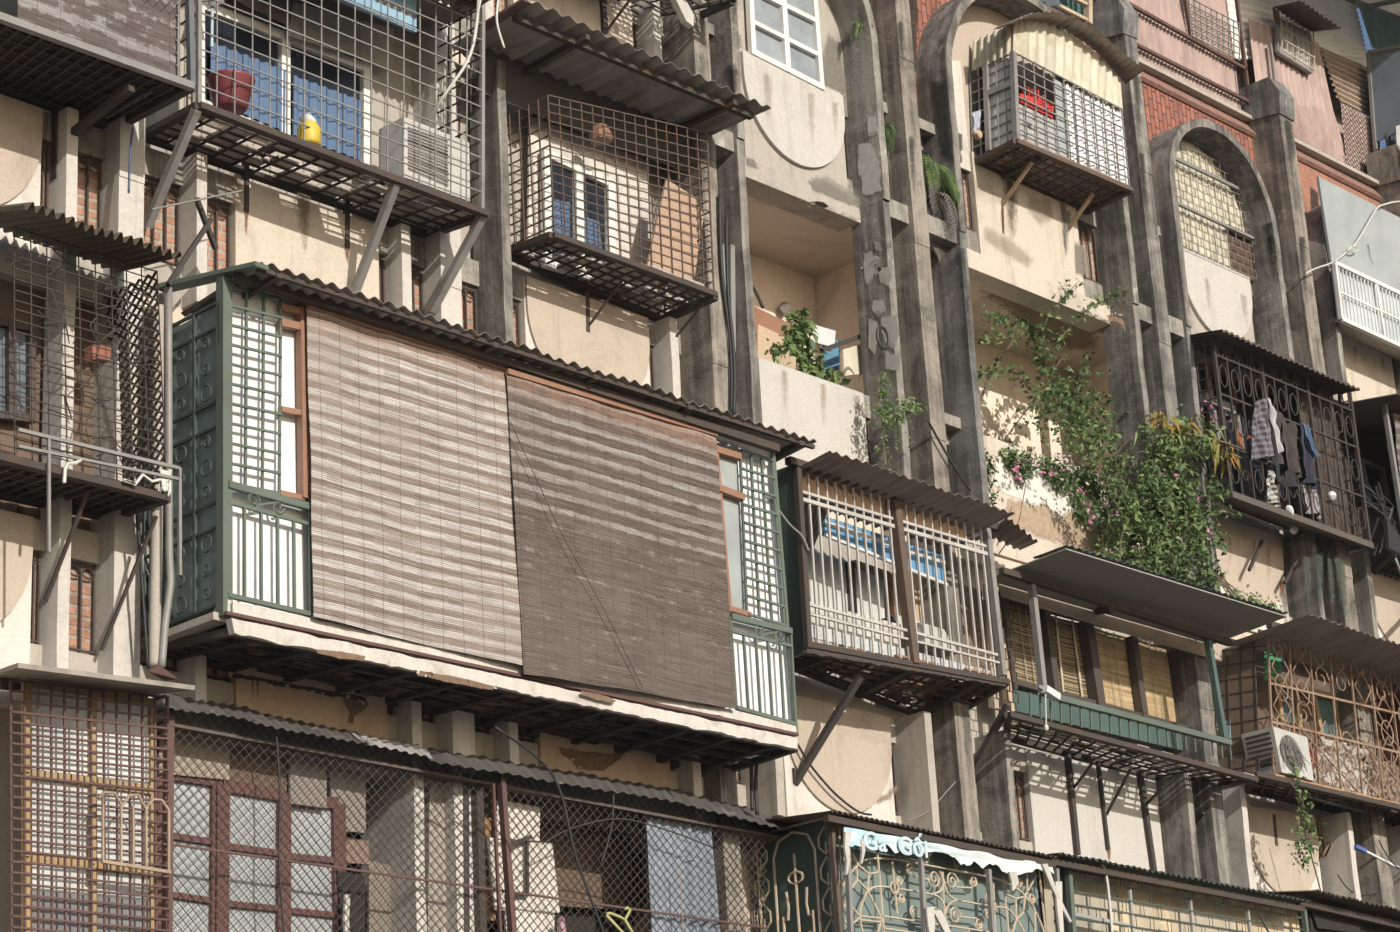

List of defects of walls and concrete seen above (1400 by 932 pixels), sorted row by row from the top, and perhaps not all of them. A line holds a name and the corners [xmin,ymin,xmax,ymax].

peeling [857,115,882,196]
leakage [297,192,310,234]
peeling [228,671,369,724]